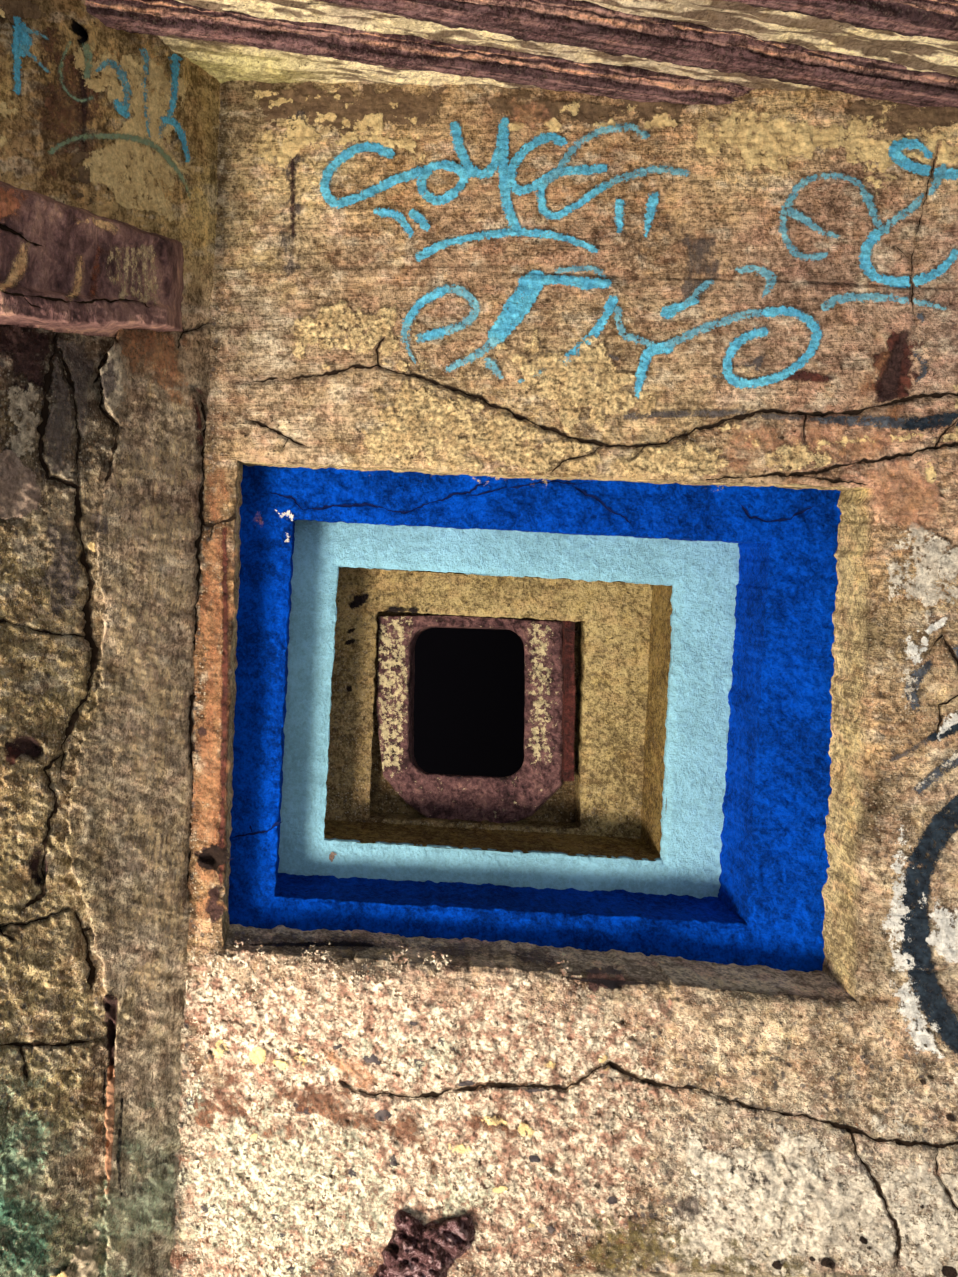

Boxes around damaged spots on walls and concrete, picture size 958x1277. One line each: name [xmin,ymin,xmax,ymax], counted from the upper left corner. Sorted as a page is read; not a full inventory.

peeling [69,18,197,223]
corrosion [0,244,28,290]
corrosion [68,256,83,296]
crack [193,388,236,651]
crack [235,338,958,523]
corrosion [816,331,925,448]
flaking render [930,385,958,442]
crack [0,289,150,991]
corrosion [193,470,234,931]
peeling [900,617,947,713]
peeling [928,712,958,741]
crack [342,1061,958,1276]